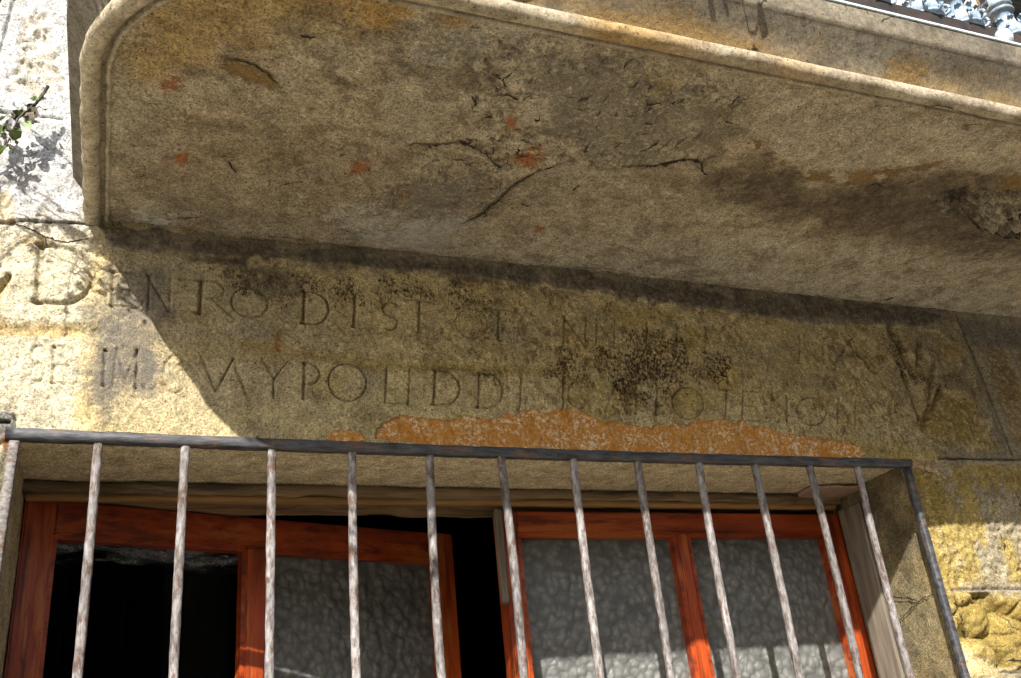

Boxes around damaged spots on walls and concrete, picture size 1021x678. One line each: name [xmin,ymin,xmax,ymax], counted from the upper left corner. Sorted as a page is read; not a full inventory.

crack [408,54,717,226]
water stain [808,161,1011,255]
water stain [613,347,672,401]